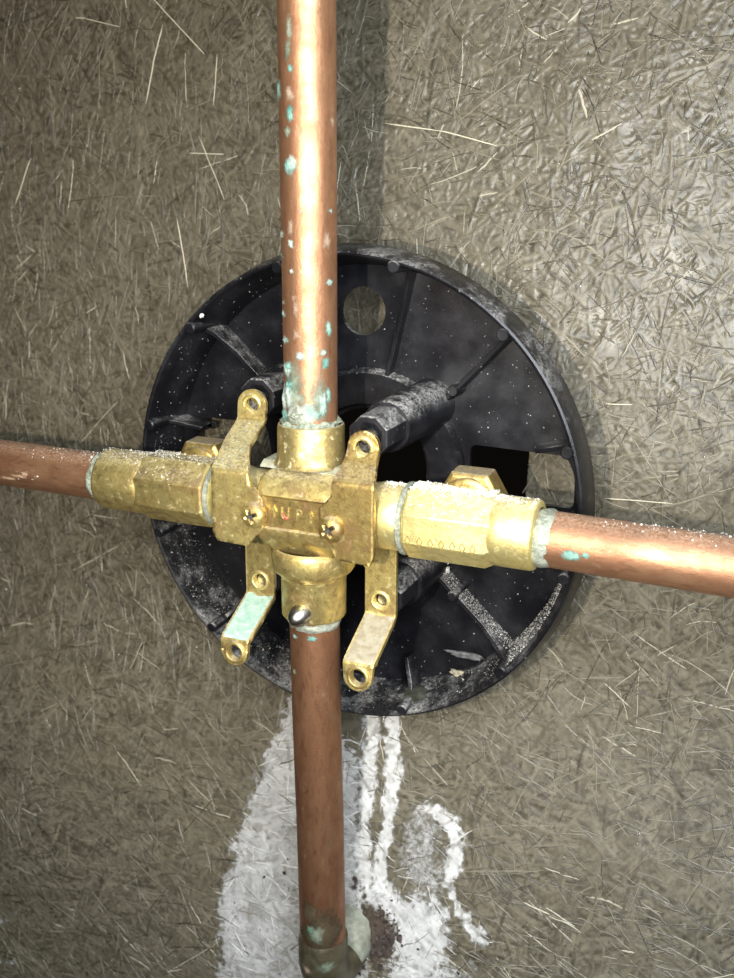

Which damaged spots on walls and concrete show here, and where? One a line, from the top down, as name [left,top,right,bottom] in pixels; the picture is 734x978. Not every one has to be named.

damp [211,695,303,978]
damp [342,715,493,978]